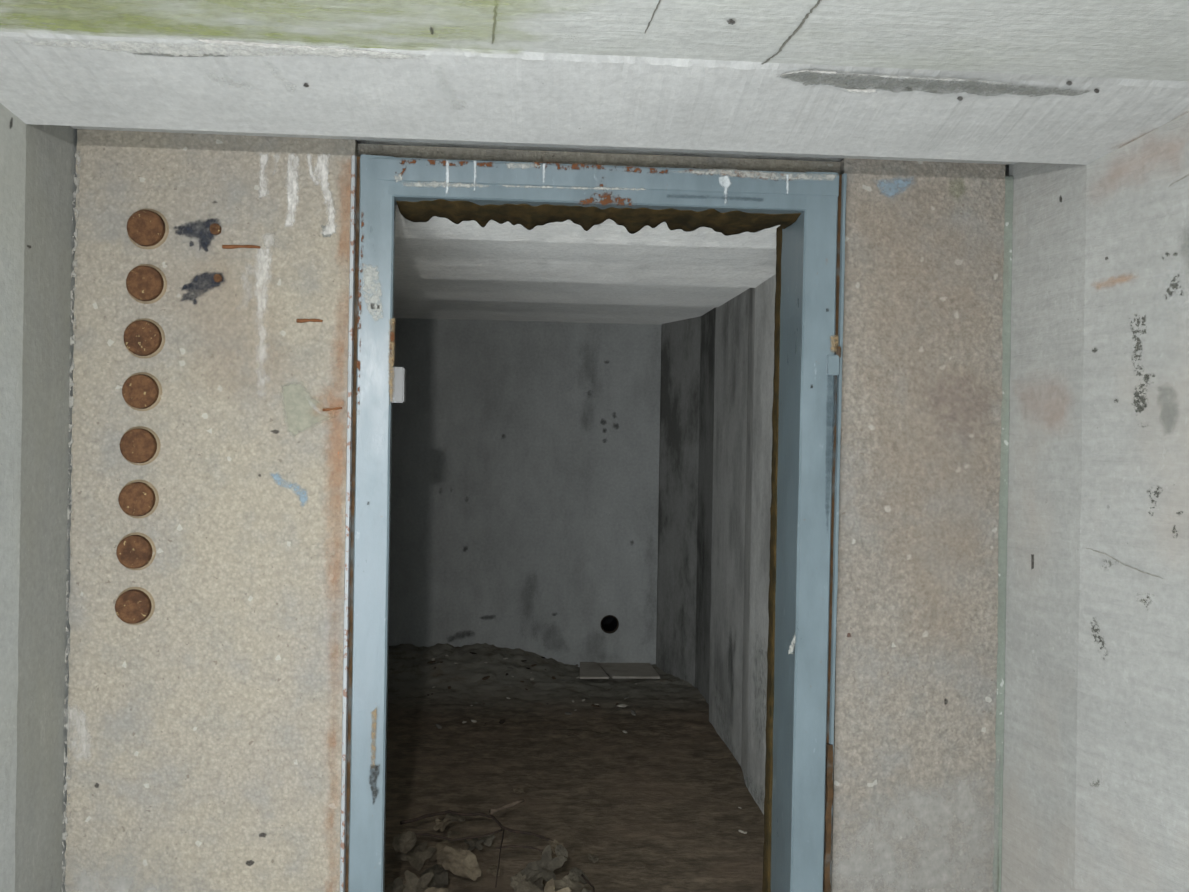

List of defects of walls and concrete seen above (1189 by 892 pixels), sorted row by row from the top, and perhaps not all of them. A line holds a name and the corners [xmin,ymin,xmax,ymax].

corrosion [395,160,492,176]
corrosion [534,162,668,174]
corrosion [580,184,632,206]